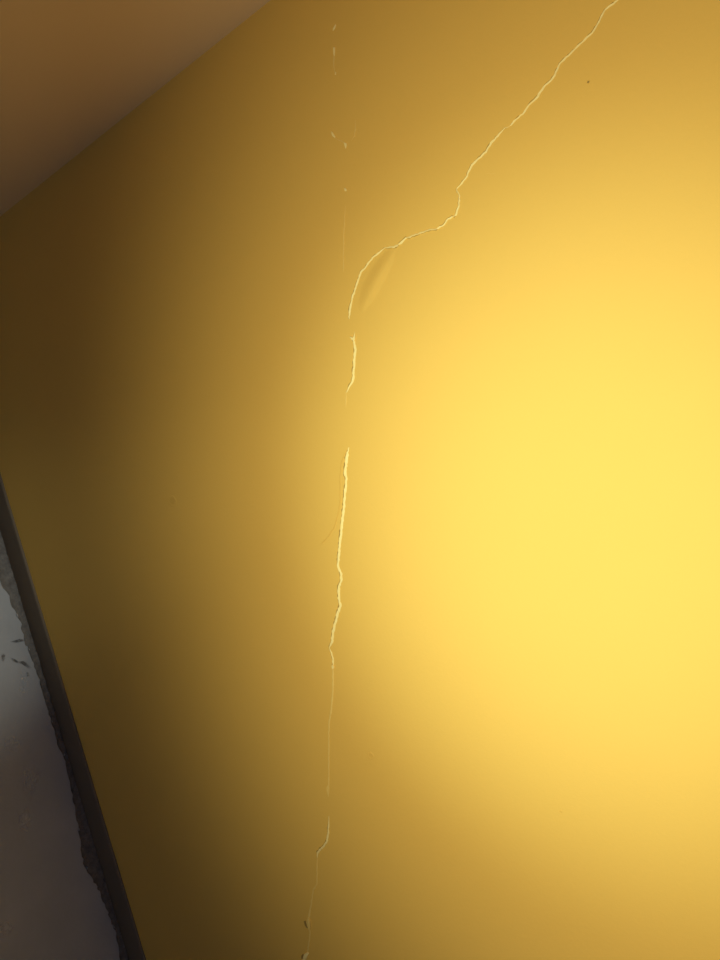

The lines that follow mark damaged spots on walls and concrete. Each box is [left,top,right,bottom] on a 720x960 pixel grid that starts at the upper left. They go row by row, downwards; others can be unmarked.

crack [343,0,618,403]
crack [301,448,349,960]